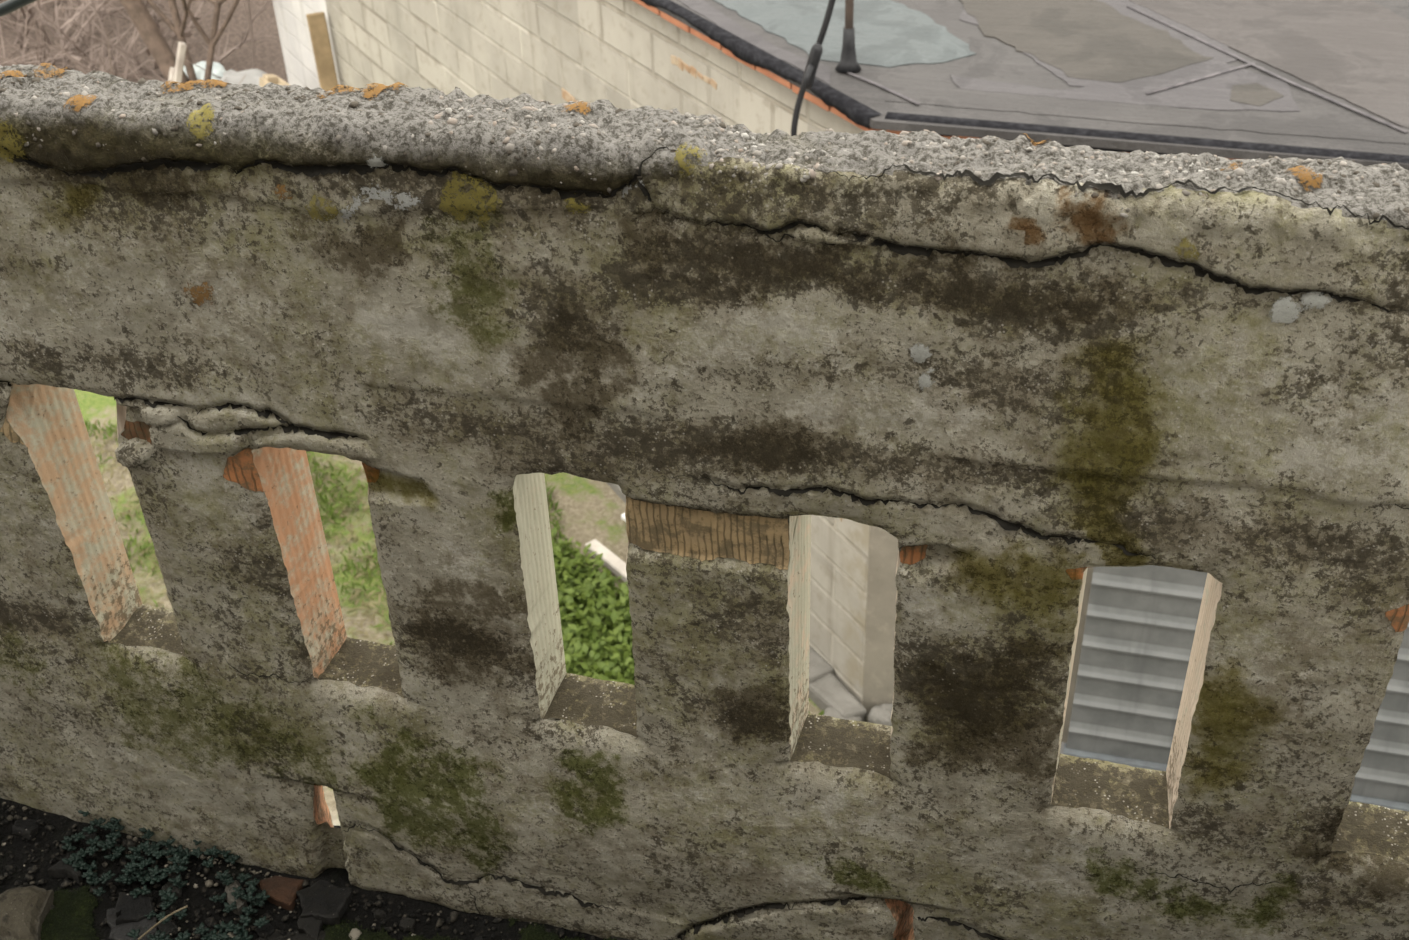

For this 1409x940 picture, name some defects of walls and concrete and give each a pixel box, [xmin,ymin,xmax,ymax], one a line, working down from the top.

crack [2,147,1409,313]
crack [114,397,366,440]
crack [633,475,1156,560]
crack [344,823,616,915]
crack [677,897,867,940]